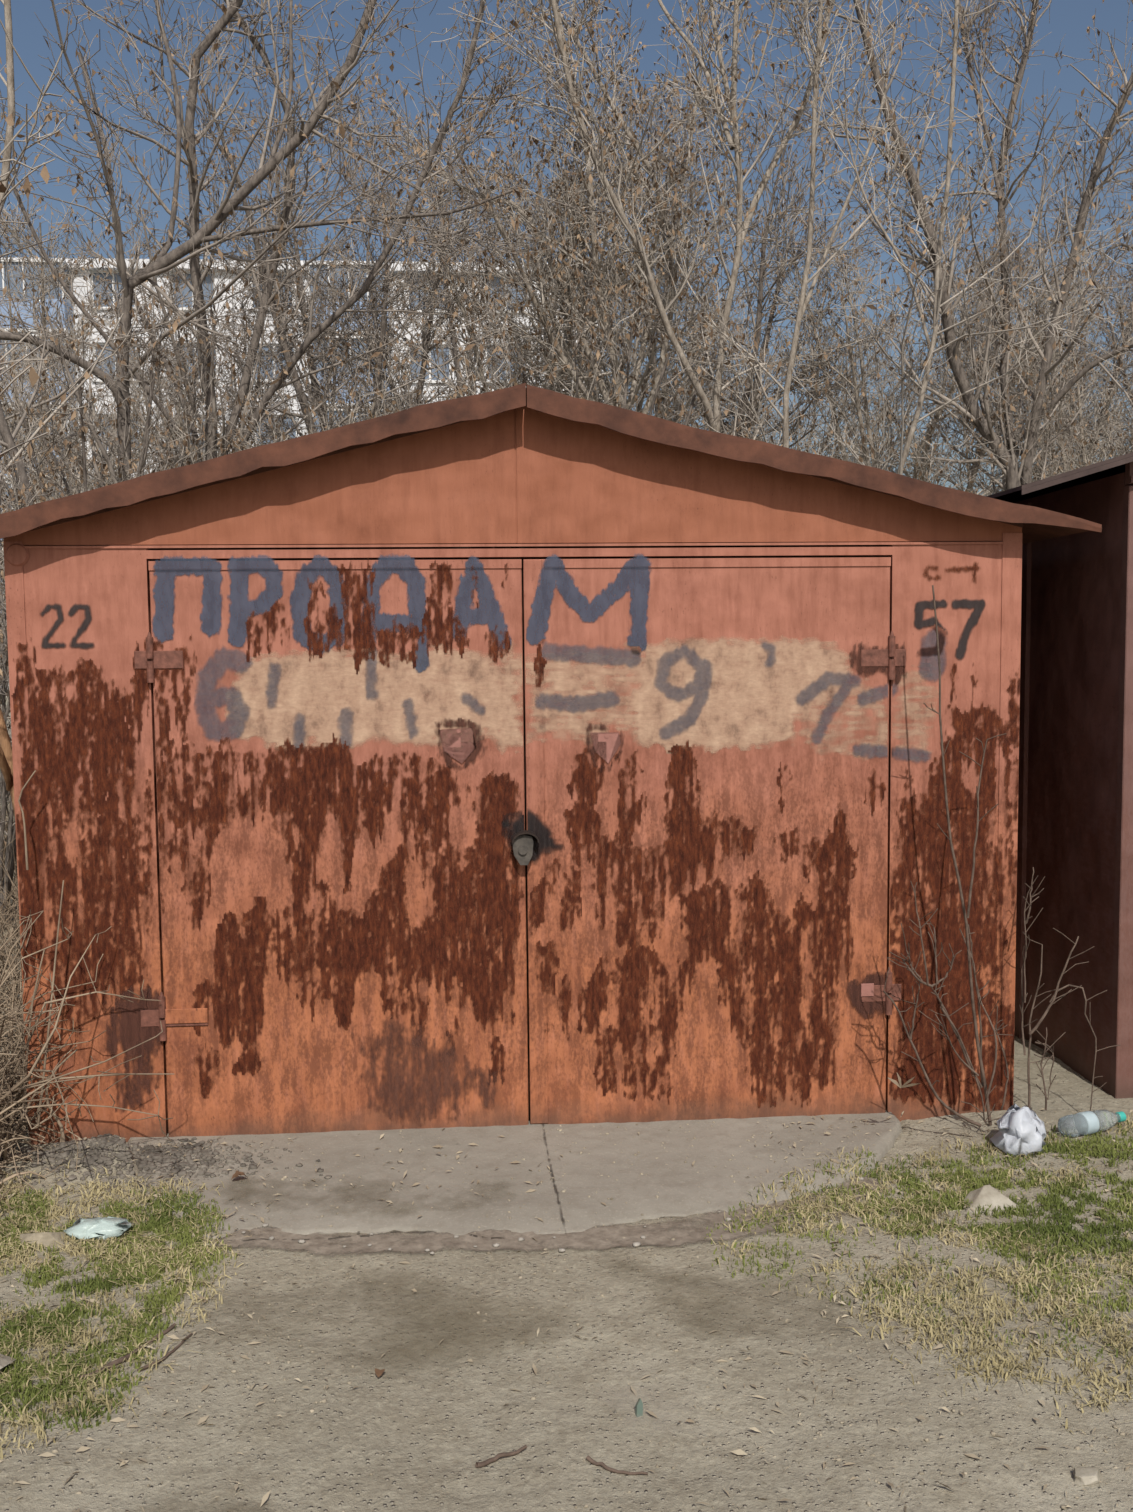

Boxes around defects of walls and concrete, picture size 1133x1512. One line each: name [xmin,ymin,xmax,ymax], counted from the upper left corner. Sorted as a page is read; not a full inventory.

corrosion [437,718,484,768]
corrosion [587,723,623,770]
corrosion [106,986,161,1111]